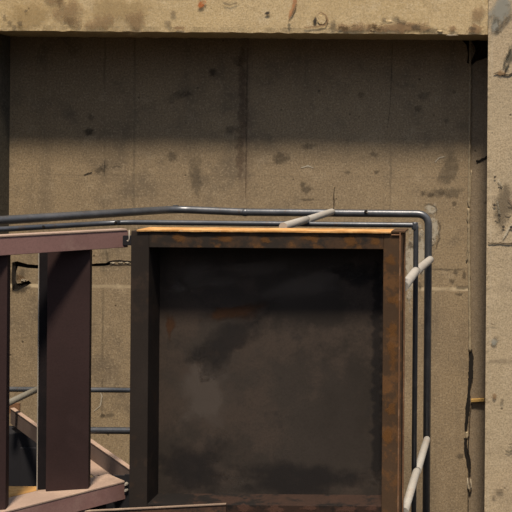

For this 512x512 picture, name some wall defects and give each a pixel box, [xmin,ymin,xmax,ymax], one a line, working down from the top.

crack [464,349,474,512]